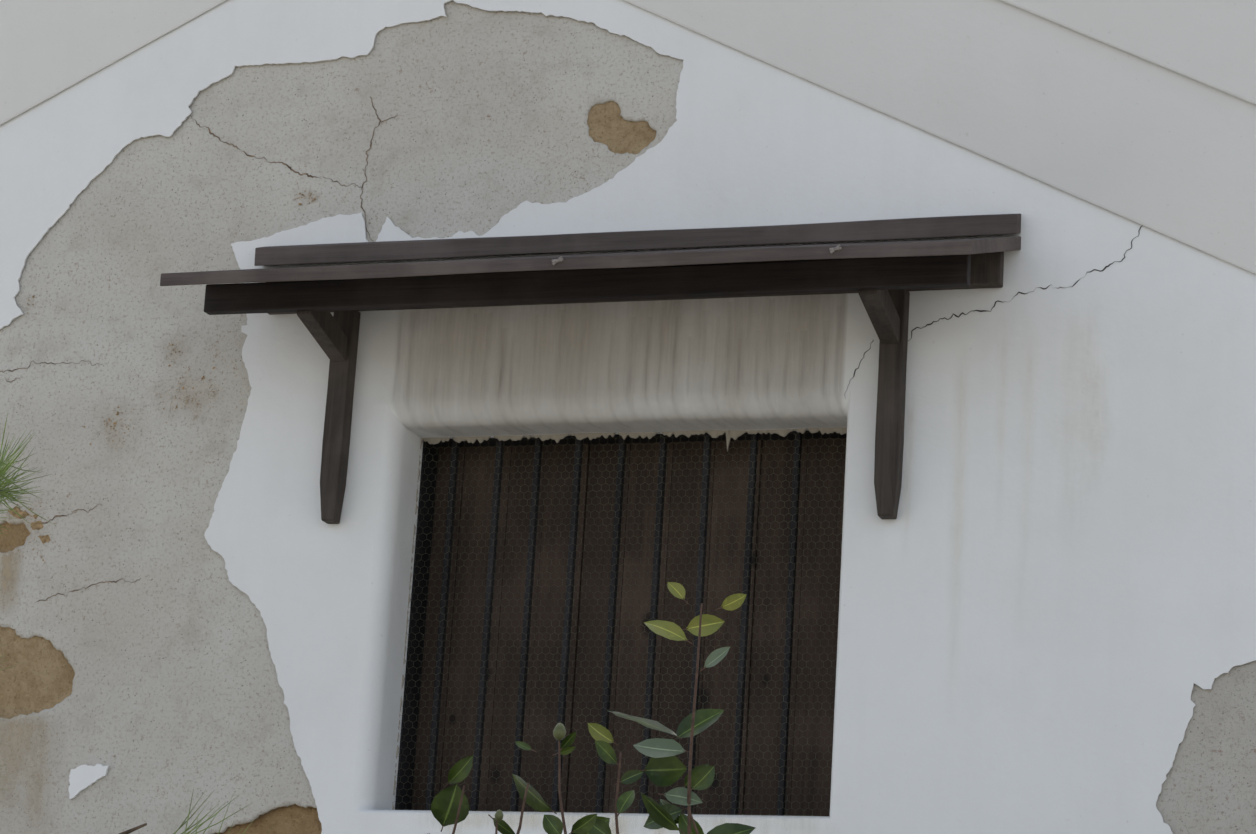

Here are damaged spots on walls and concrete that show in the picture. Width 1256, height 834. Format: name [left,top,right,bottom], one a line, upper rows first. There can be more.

crack [190,97,397,241]
crack [908,225,1143,341]
crack [0,360,102,382]
peeling [0,0,683,834]
crack [42,504,101,524]
crack [37,578,141,602]
peeling [1156,661,1256,834]